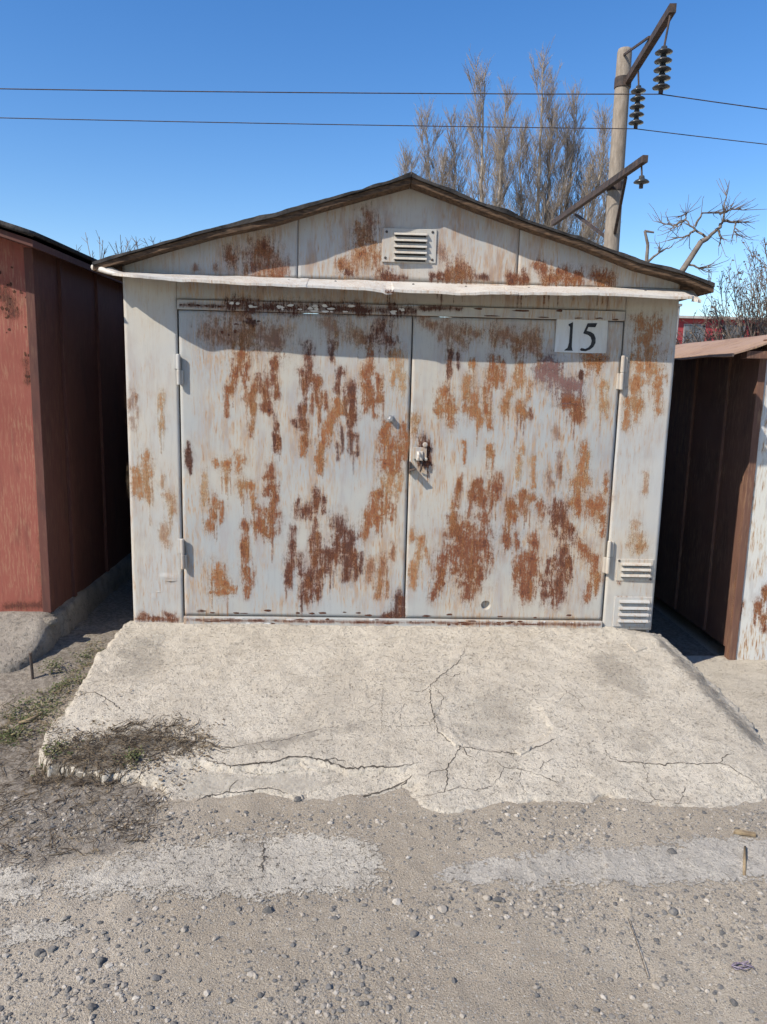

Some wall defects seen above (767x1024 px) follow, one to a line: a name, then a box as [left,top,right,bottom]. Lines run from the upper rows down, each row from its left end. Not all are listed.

rust [213,236,290,278]
rust [335,206,408,303]
rust [429,244,490,305]
rust [505,260,618,310]
rust [621,310,668,431]
rust [132,311,610,626]
rust [626,520,646,553]
crack [195,642,565,802]
crack [605,750,764,804]